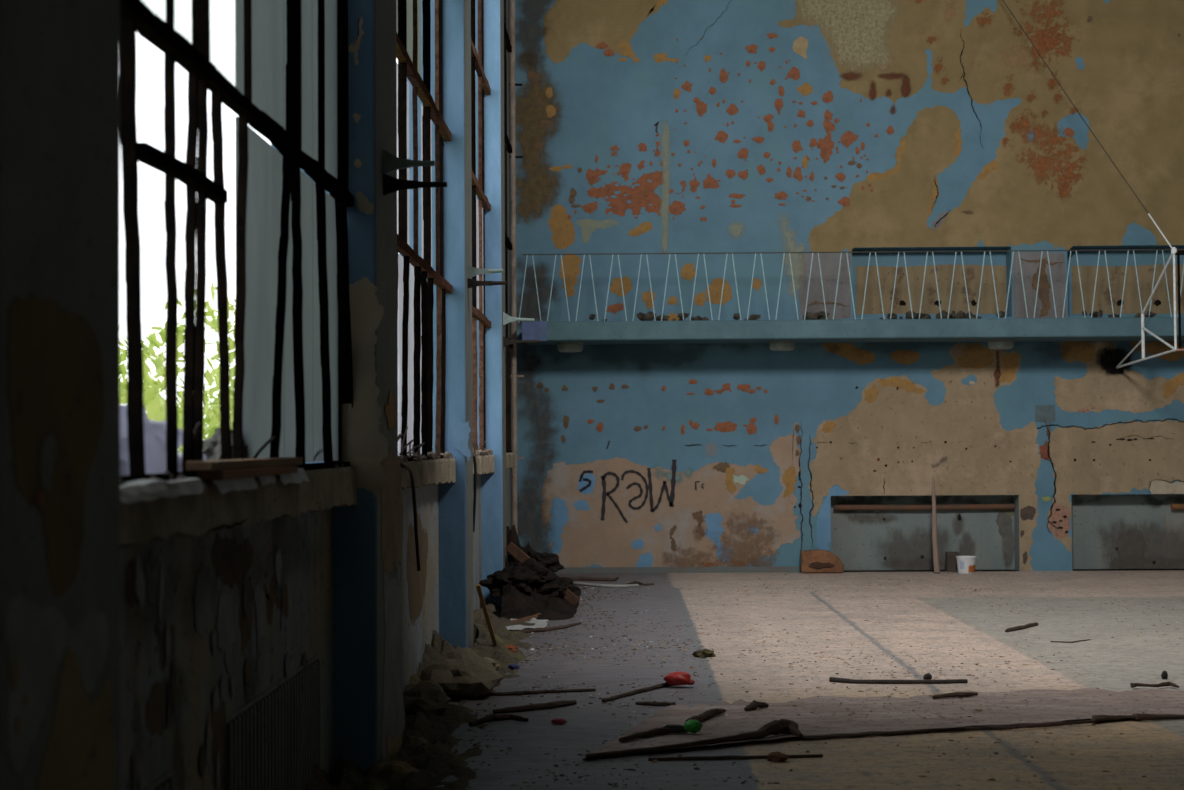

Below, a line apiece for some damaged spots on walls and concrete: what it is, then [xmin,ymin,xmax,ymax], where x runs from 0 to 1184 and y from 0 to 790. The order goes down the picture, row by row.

damp [515,0,573,220]
peeling [543,0,1184,321]
crack [959,28,982,146]
rust [1003,95,1085,198]
peeling [342,277,428,625]
peeling [540,341,1184,571]